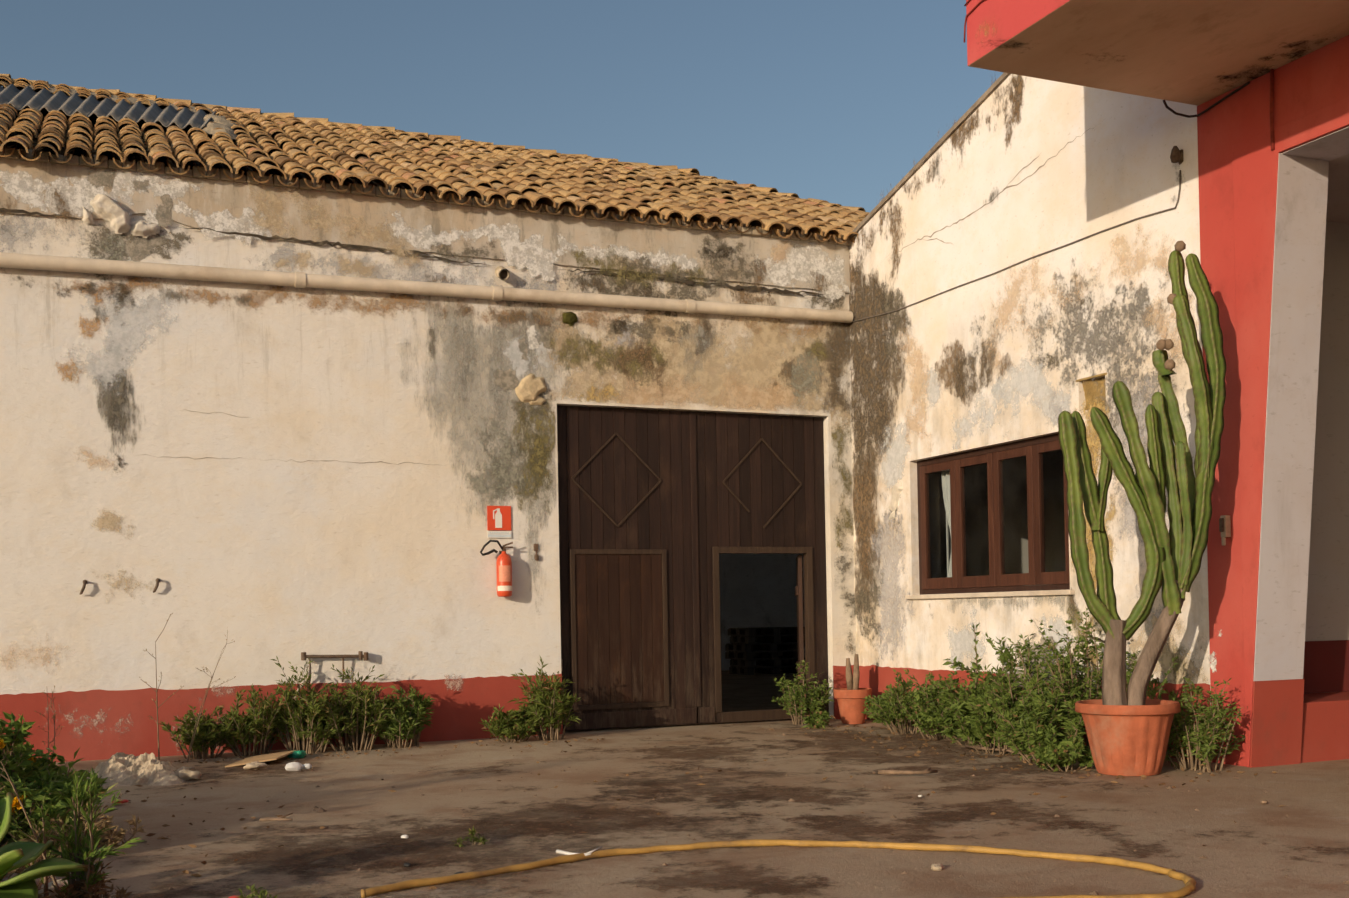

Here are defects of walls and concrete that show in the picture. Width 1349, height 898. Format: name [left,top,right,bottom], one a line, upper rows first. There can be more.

leakage [938,75,1024,150]
crack [0,208,71,218]
peeling [0,158,272,262]
crack [173,227,494,266]
crack [884,123,1101,259]
leakage [56,277,135,326]
leakage [95,341,136,444]
leakage [250,158,1182,654]
leakage [948,589,1103,670]